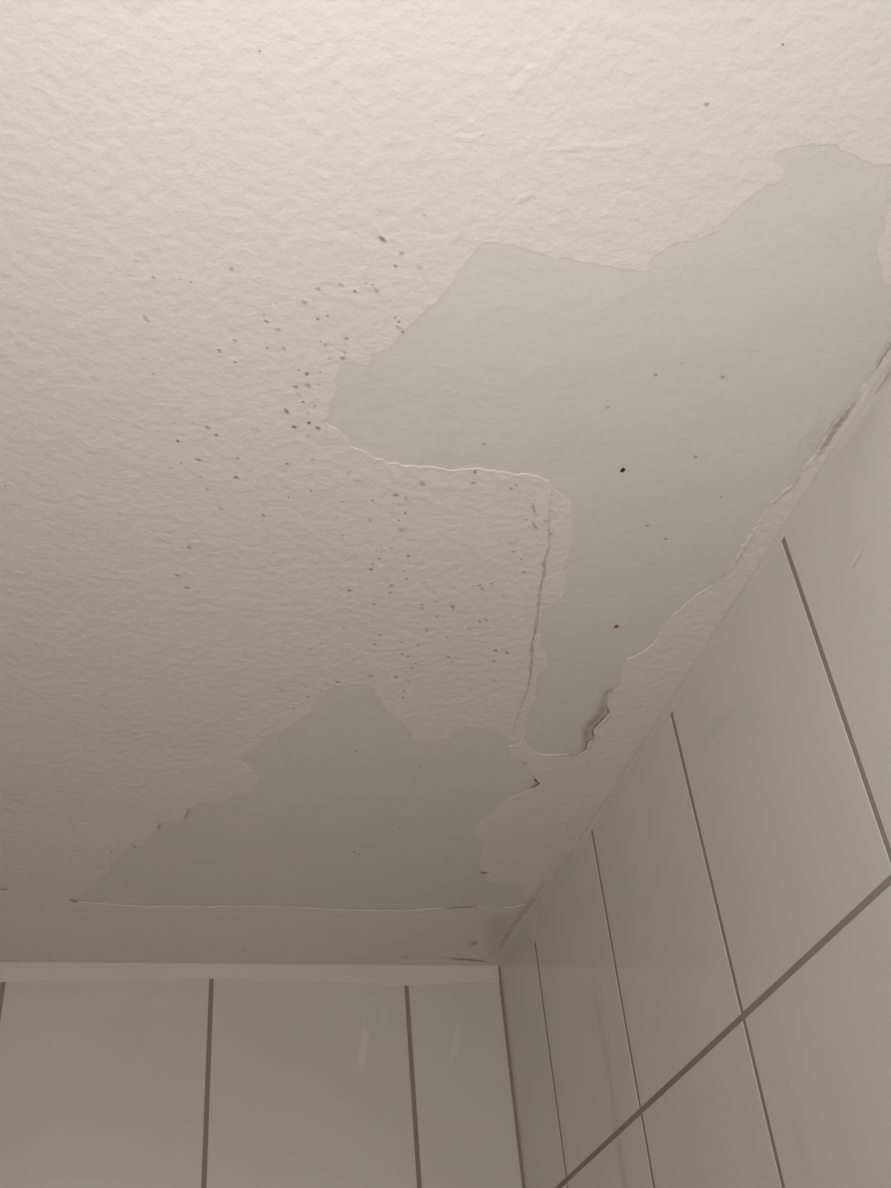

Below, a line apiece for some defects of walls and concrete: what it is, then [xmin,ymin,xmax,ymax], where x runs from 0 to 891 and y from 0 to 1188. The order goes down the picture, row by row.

leakage [283,336,350,438]
crack [513,490,555,728]